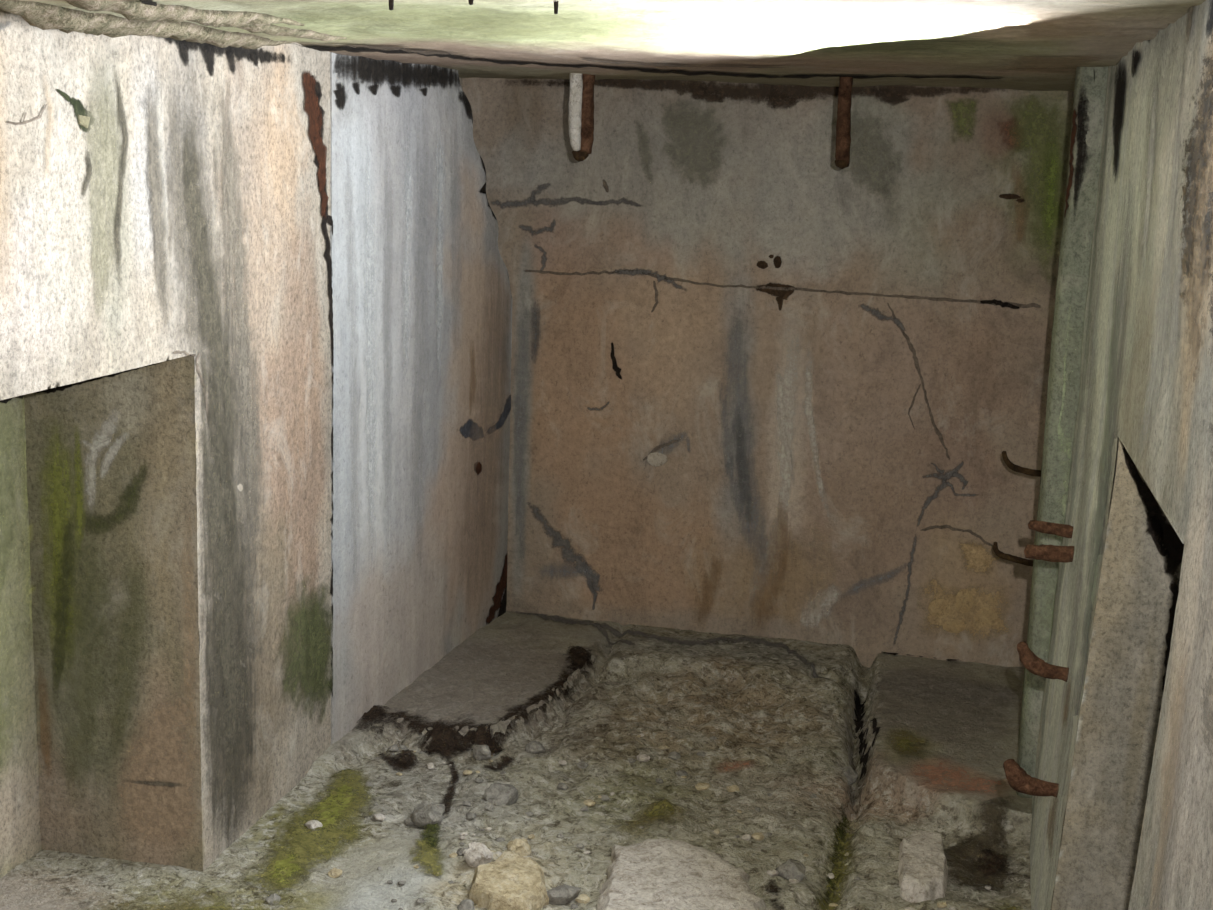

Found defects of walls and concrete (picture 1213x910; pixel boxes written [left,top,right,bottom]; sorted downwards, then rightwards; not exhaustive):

crack [296,44,1001,384]
water stain [53,413,125,688]
water stain [148,89,262,835]
crack [327,647,335,726]
crack [328,429,336,617]
crack [486,503,880,804]
crack [472,116,1040,661]
water stain [723,330,823,583]